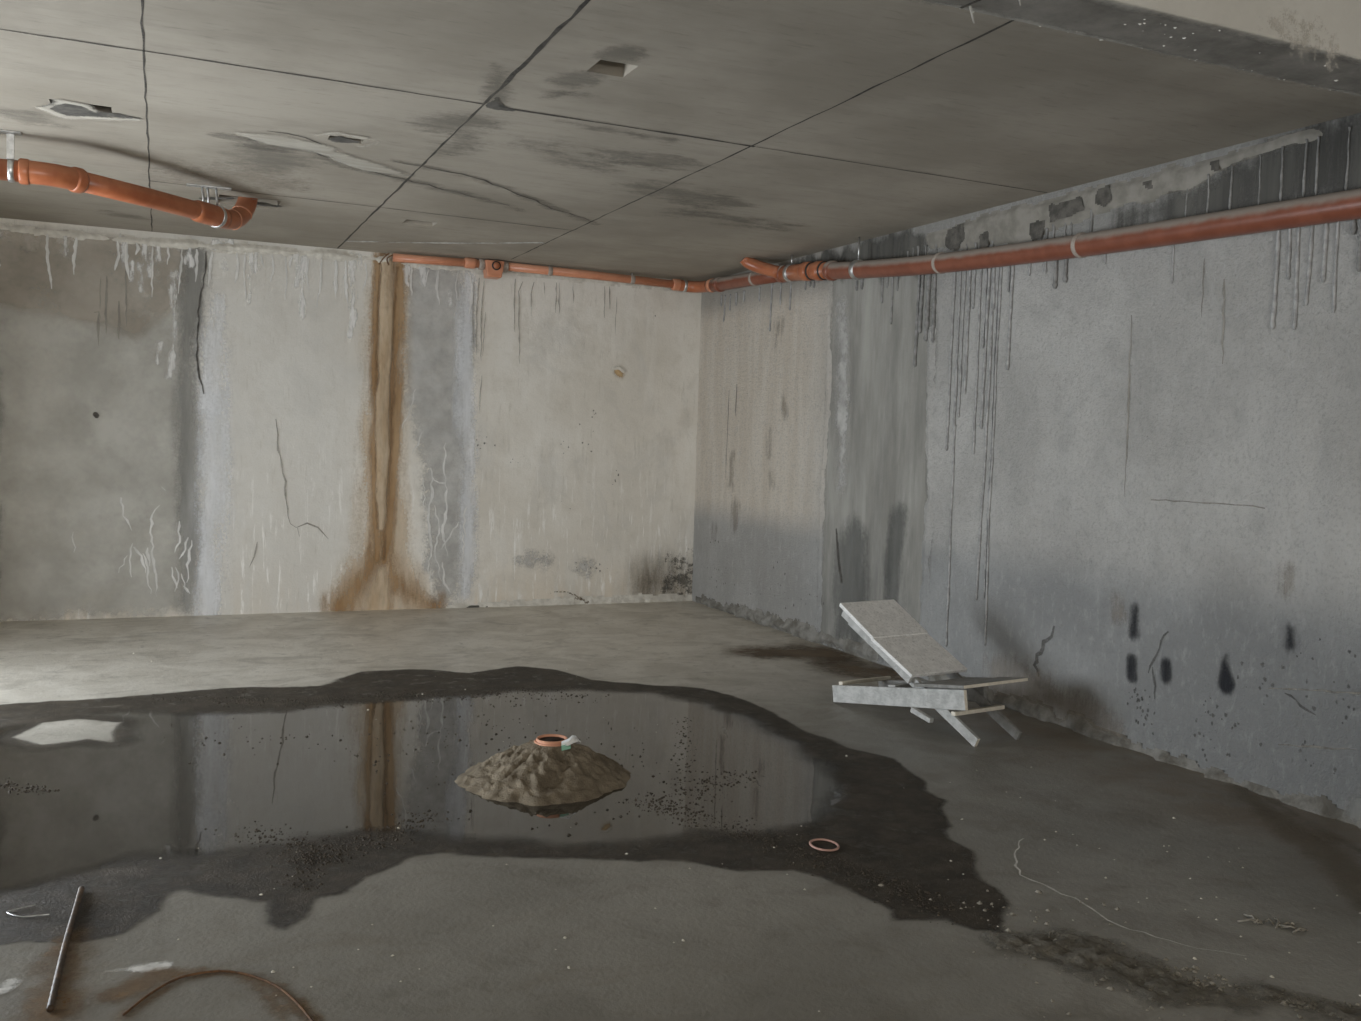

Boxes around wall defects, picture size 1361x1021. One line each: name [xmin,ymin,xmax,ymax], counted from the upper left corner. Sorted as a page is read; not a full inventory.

crack [237,131,593,222]
peeling [925,128,1323,250]
crack [196,252,207,394]
leakage [0,233,375,622]
crack [276,421,327,537]
rust [331,253,442,611]
crack [1033,626,1055,677]
leakage [1127,655,1137,681]
leakage [1130,606,1138,637]
leakage [1161,660,1171,683]
leakage [1218,658,1235,693]
leakage [0,666,1008,944]